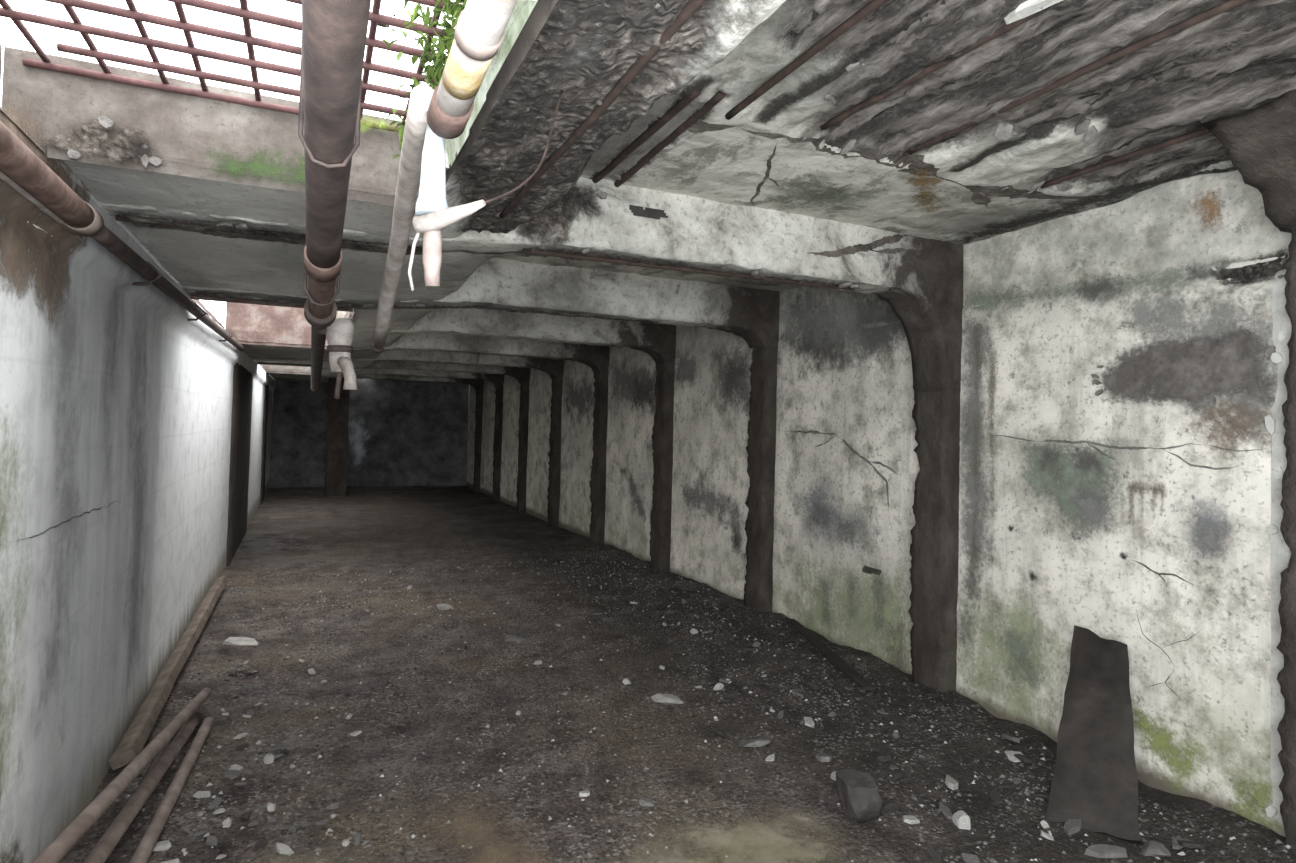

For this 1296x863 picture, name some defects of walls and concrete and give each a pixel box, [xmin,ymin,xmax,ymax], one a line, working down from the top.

spalling [444,0,1296,291]
crack [687,120,1111,207]
water stain [1055,258,1277,442]
crack [781,430,896,530]
water stain [1021,438,1124,531]
crack [992,435,1271,470]